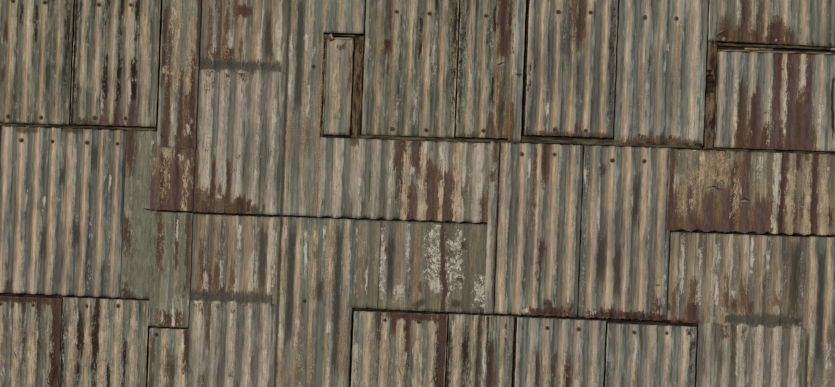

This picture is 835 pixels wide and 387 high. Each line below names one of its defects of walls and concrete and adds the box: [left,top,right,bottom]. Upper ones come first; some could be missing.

rust [148,0,265,298]
rust [393,140,468,222]
rust [525,0,834,234]
rust [0,296,61,387]
rust [122,210,133,258]
rust [149,307,189,387]
rust [193,303,220,350]
peeling [291,141,488,387]
rust [534,237,546,292]
peeling [552,156,608,315]
rust [522,276,699,323]
rust [722,274,754,315]